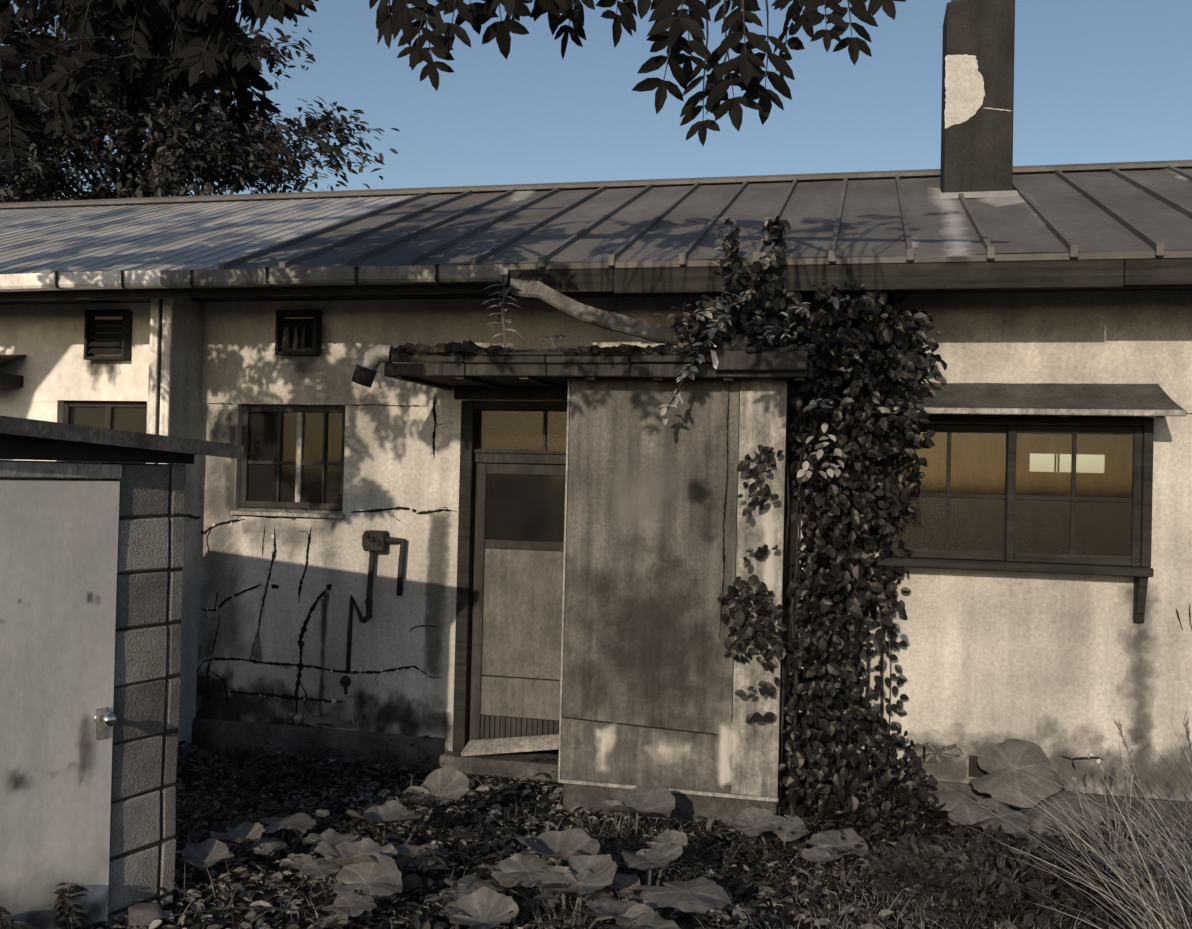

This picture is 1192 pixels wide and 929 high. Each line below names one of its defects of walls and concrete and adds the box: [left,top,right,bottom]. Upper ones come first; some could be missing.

flaking render [944,54,985,128]
crack [354,392,444,460]
crack [184,506,441,720]
leakage [604,596,706,695]
leakage [196,671,452,737]
peeling [596,727,615,770]
peeling [718,725,738,785]
leakage [916,742,982,783]
leakage [1049,631,1192,798]